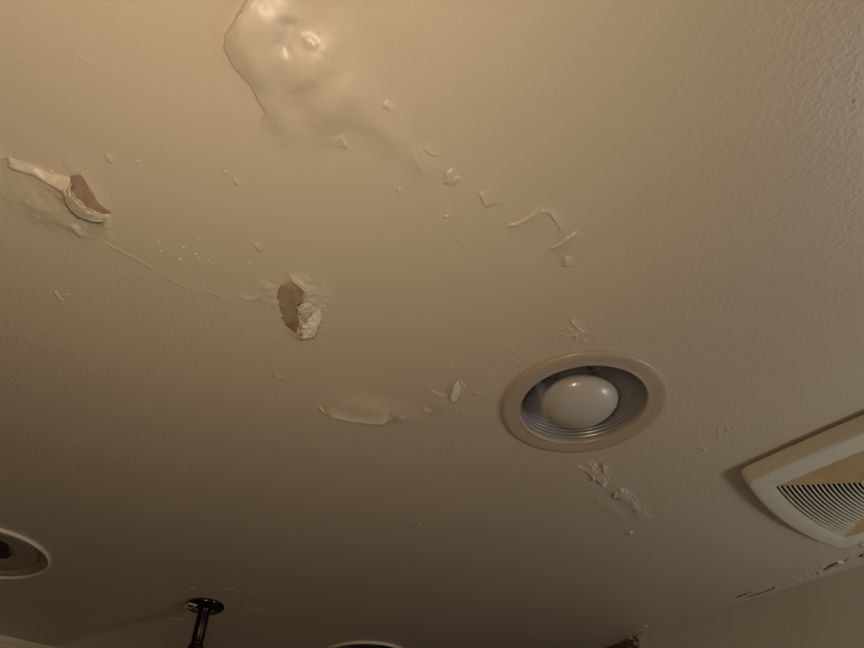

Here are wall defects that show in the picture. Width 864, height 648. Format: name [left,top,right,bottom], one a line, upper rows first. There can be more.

peeling [0,144,117,247]
peeling [237,267,338,350]